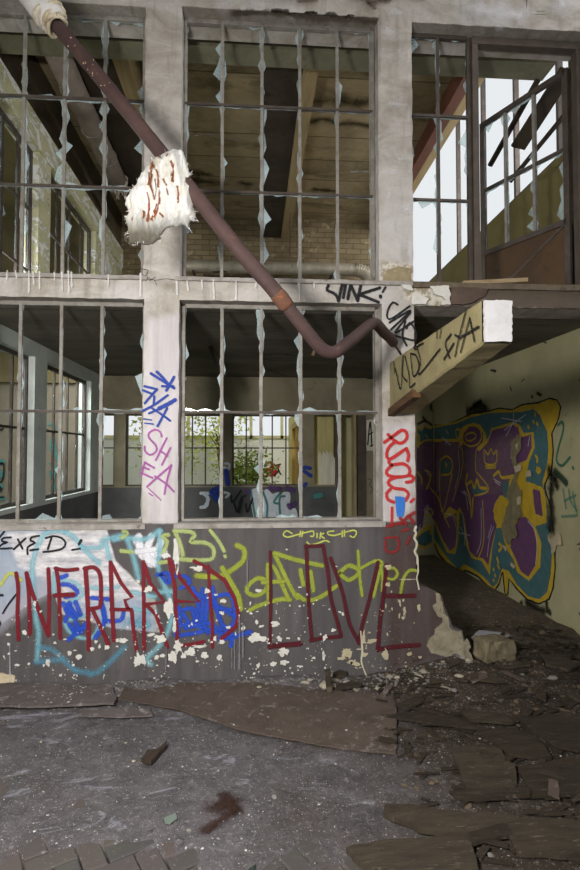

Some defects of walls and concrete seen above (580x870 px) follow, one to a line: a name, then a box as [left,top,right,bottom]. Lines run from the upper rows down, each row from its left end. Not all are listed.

peeling [383,266,451,306]
peeling [161,540,203,574]
peeling [0,598,225,683]
peeling [205,526,420,679]
flaking render [405,593,474,668]